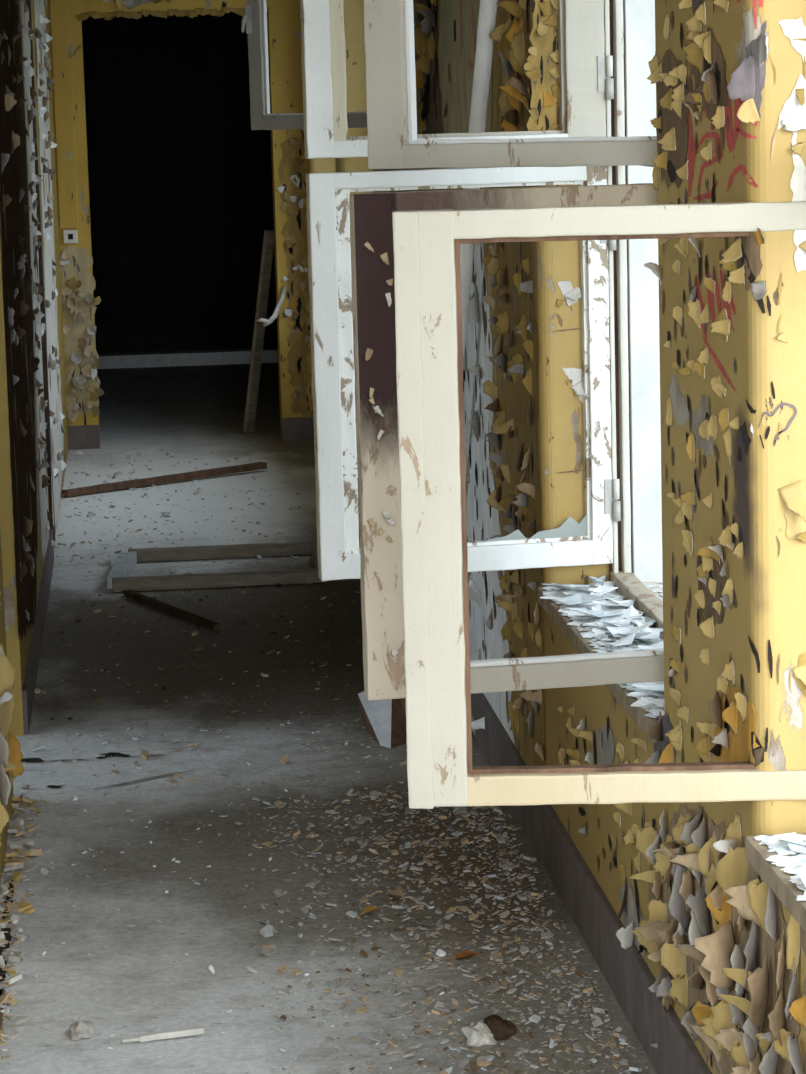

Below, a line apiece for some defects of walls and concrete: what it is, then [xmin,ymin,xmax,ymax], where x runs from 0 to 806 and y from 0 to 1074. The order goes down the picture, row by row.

flaking render [413,0,560,135]
peeling [647,0,806,204]
peeling [0,0,104,641]
peeling [277,137,313,418]
peeling [463,242,543,542]
peeling [557,281,581,306]
peeling [562,368,588,403]
peeling [644,228,771,342]
peeling [793,230,806,272]
peeling [468,375,765,767]
peeling [0,644,25,846]
peeling [791,652,806,697]